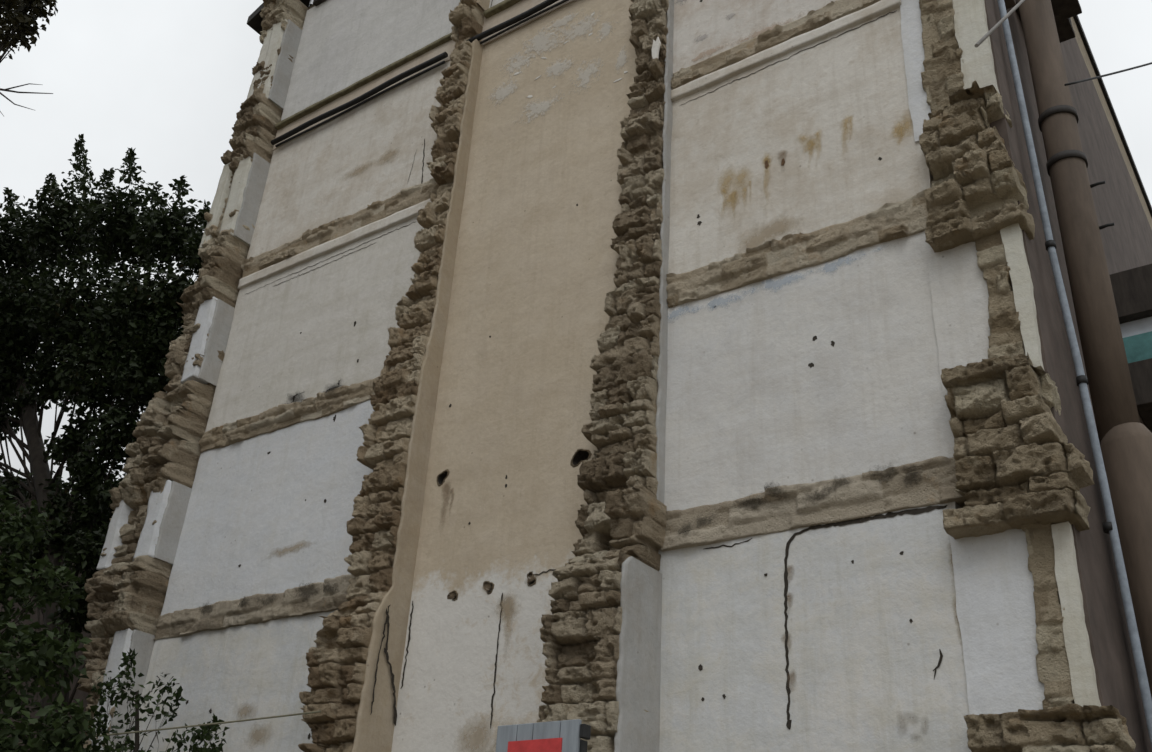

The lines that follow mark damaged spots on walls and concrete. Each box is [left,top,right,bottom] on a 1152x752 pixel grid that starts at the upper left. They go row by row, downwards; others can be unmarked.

spalling [437,469,450,486]
hole [570,449,592,467]
crack [370,601,414,726]
spalling [483,581,494,594]
crack [490,593,503,729]
crack [784,505,948,730]